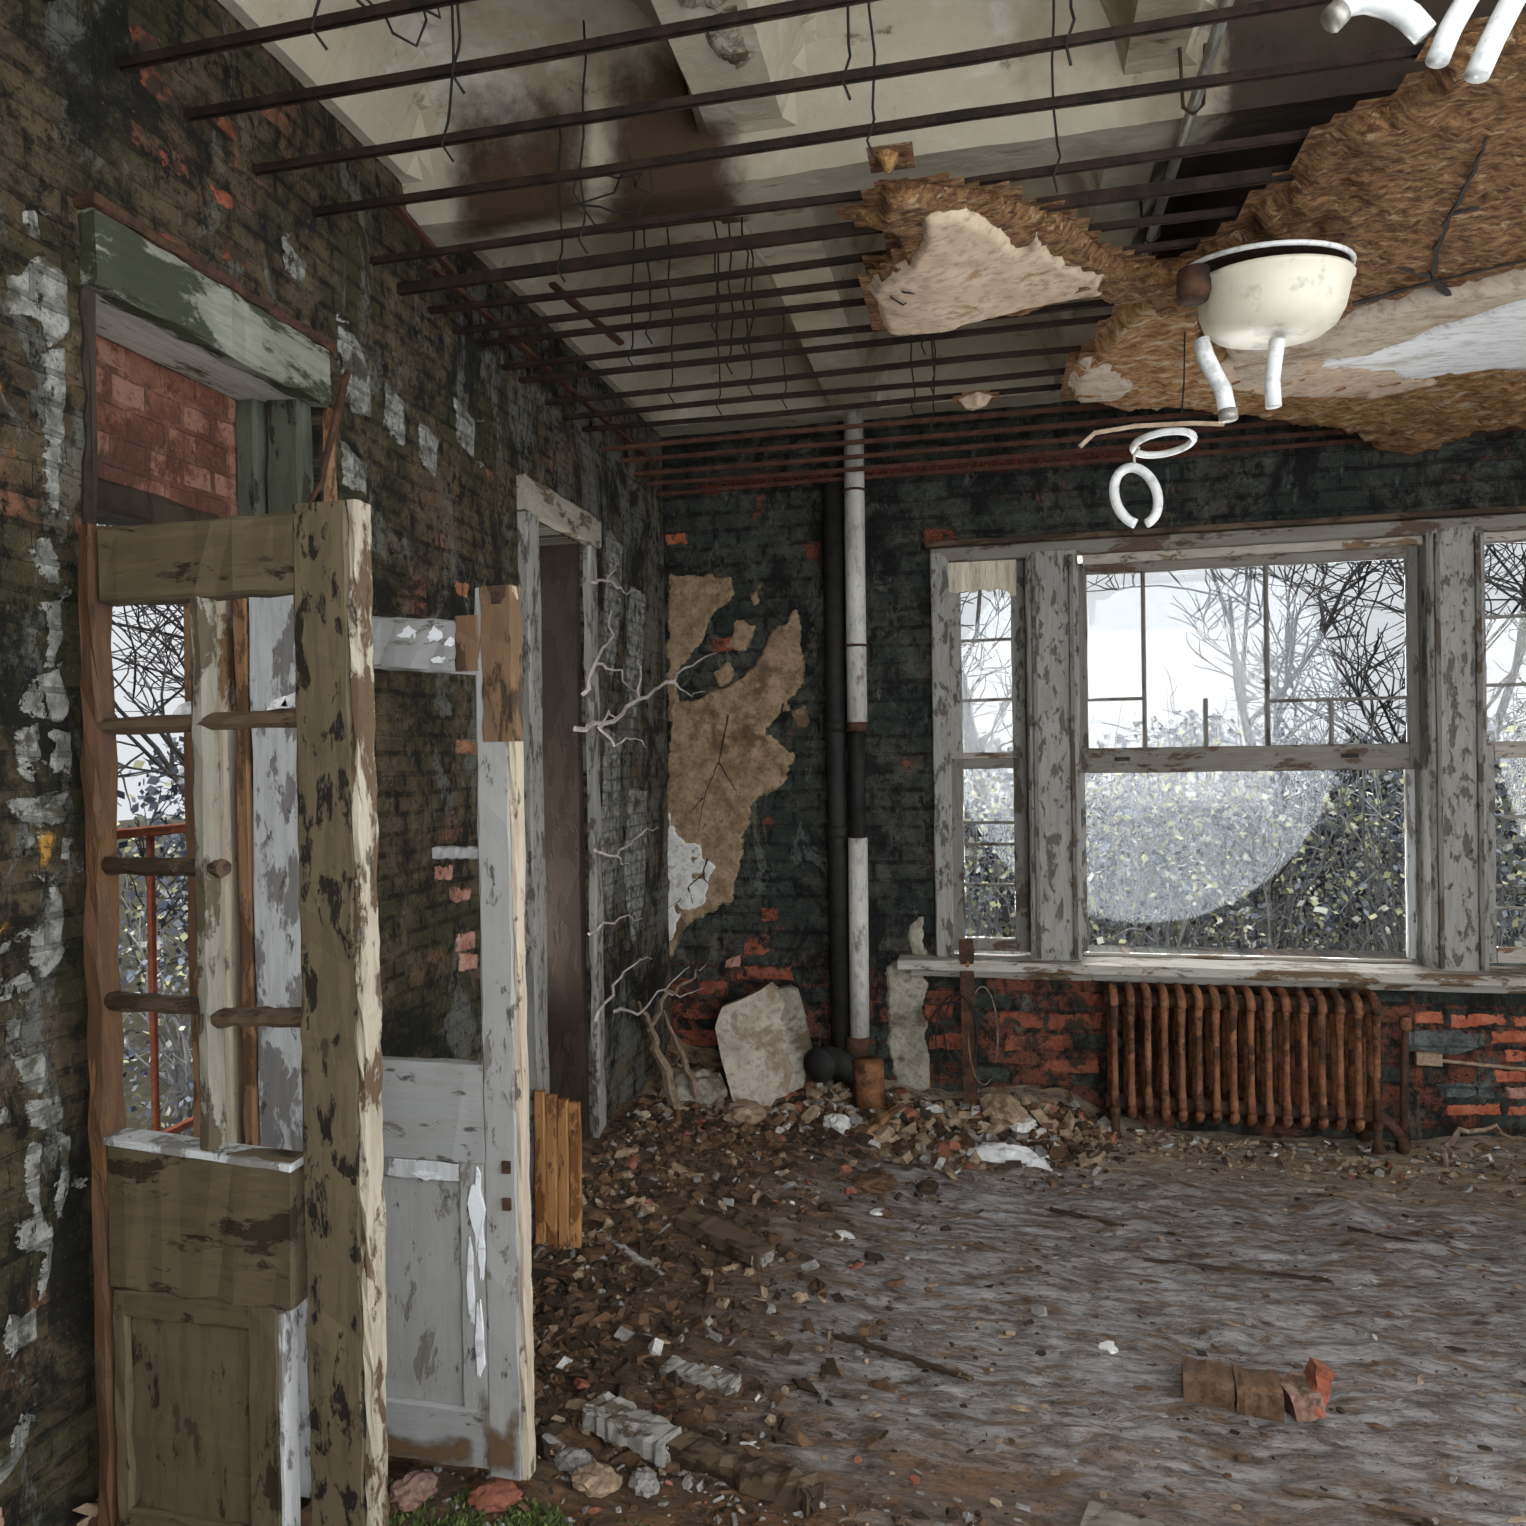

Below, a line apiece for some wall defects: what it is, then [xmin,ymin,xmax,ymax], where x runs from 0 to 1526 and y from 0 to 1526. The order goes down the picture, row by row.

damp [457,96,585,236]
damp [606,57,744,233]
peeling [0,198,73,520]
corrosion [864,444,1201,475]
peeling [601,530,809,956]
peeling [0,538,88,1484]
spalling [671,942,793,1046]
spalling [999,992,1104,1074]